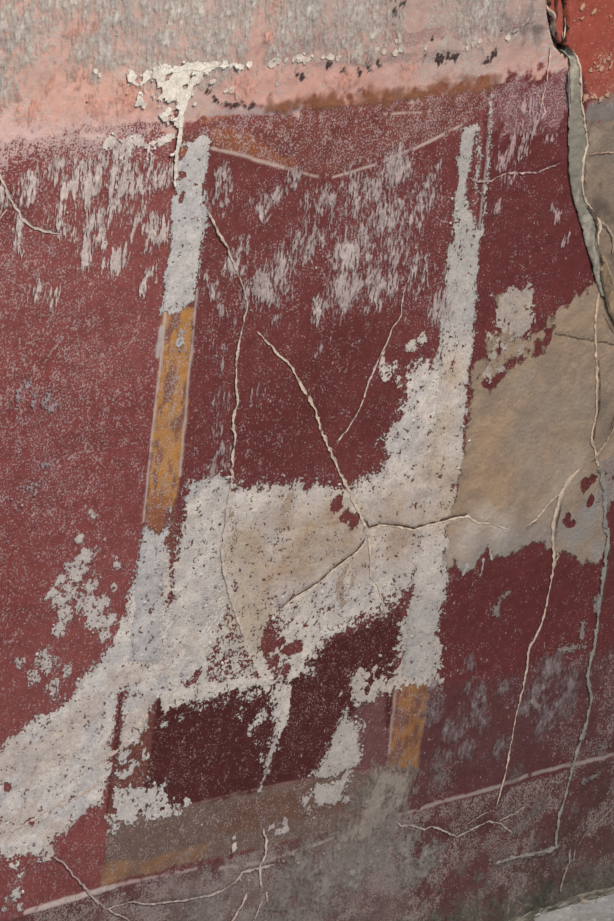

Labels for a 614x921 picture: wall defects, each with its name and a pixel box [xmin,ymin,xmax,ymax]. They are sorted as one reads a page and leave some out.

crack [0,174,60,234]
flaking render [584,120,614,289]
damp [0,0,558,723]
crack [206,0,614,892]
flaking render [0,281,614,912]
damp [430,655,490,791]
damp [517,592,603,741]
crack [52,829,274,921]
damp [254,777,446,921]